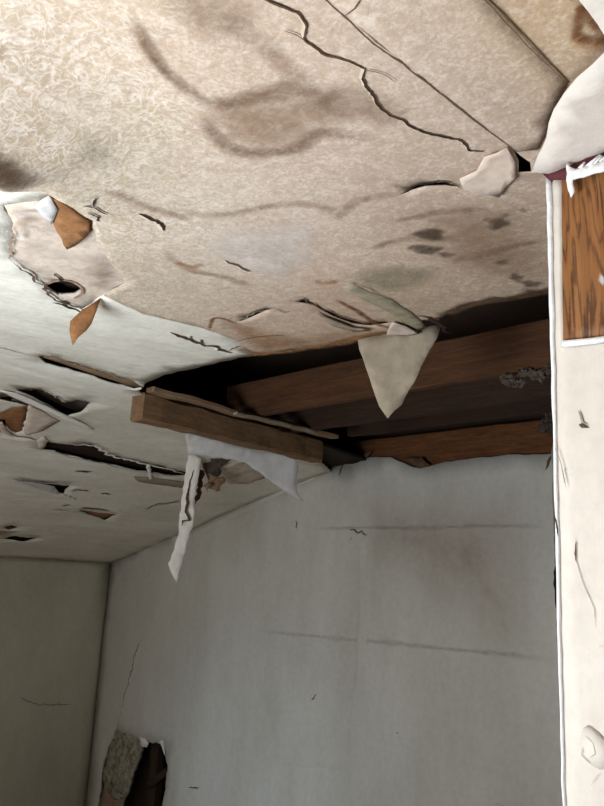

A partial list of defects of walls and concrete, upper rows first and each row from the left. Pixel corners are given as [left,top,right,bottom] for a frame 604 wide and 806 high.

crack [266,0,482,152]
leakage [0,163,23,187]
peeling [566,154,604,198]
spalling [4,201,124,312]
leakage [413,230,448,256]
crack [169,333,240,354]
leakage [208,302,387,355]
peeling [0,399,59,448]
spalling [100,729,149,806]